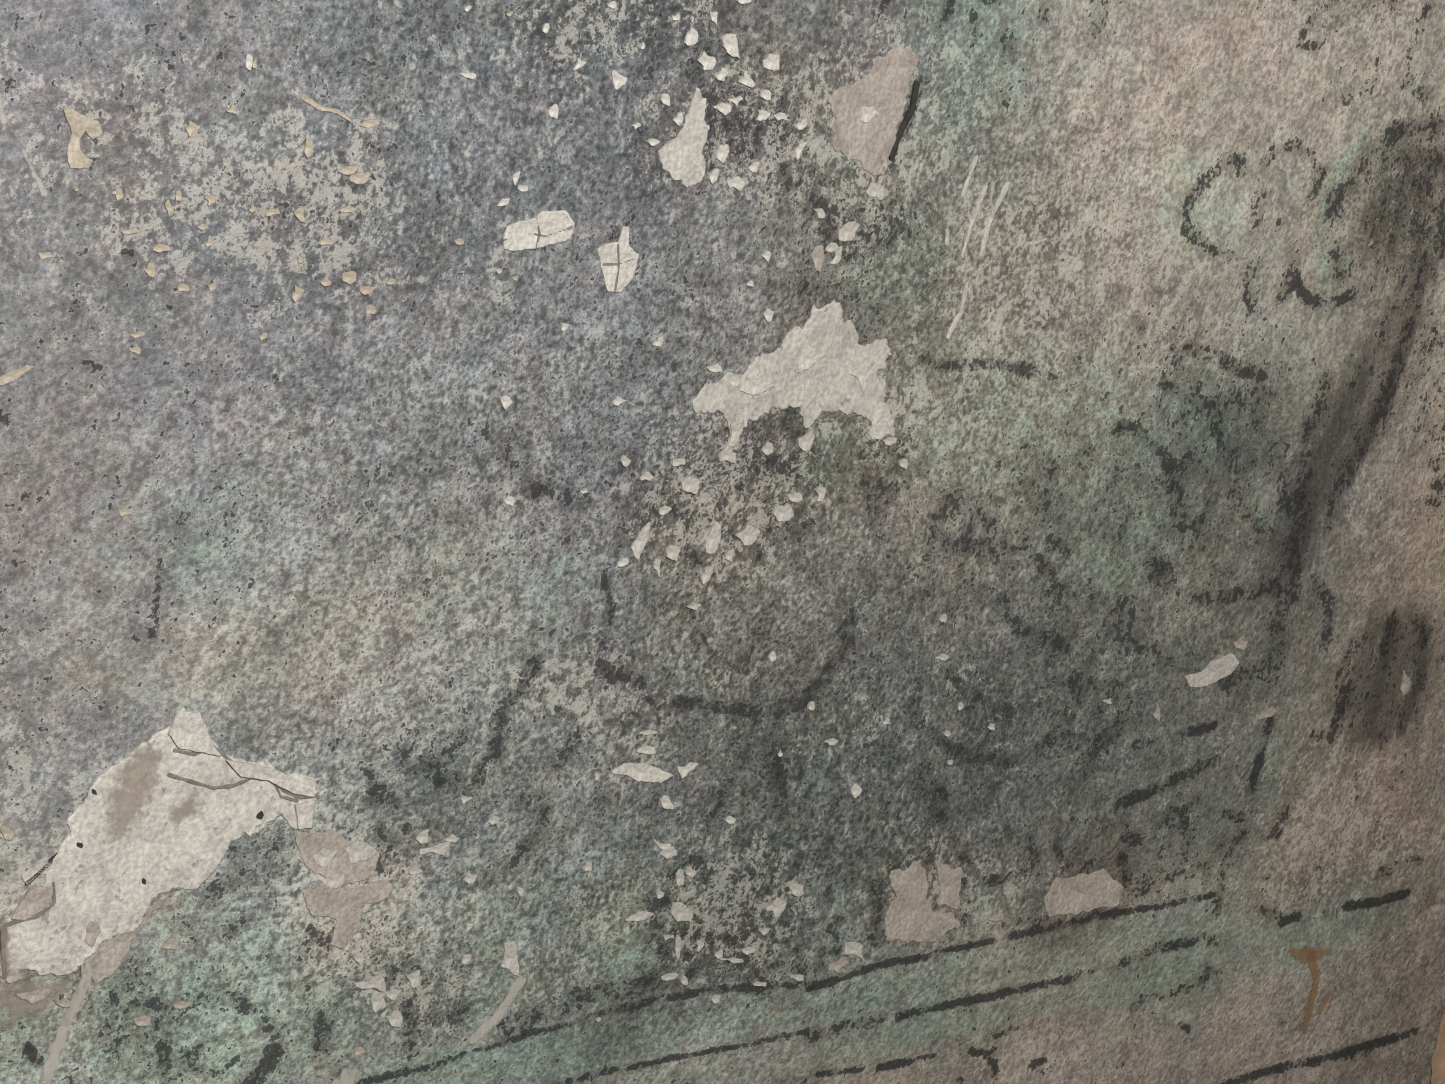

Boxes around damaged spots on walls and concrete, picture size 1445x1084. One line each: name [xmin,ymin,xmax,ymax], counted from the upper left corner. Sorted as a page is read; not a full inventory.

spalling [631,11,808,191]
spalling [827,46,920,200]
spalling [502,210,575,251]
spalling [597,226,639,292]
spalling [810,221,860,273]
spalling [692,300,909,469]
peeling [617,505,681,577]
peeling [772,486,827,522]
spalling [0,707,420,1027]
spalling [884,861,963,943]
spalling [1044,869,1124,917]
corrosion [1290,946,1332,1034]